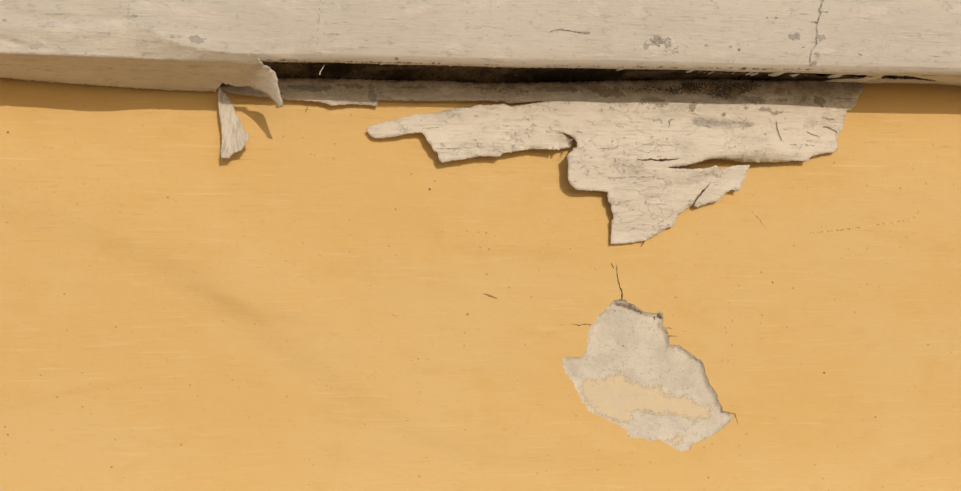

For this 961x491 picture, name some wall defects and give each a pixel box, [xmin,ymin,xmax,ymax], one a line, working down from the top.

crack [810,0,862,79]
peeling [0,0,961,244]
spalling [562,299,733,452]